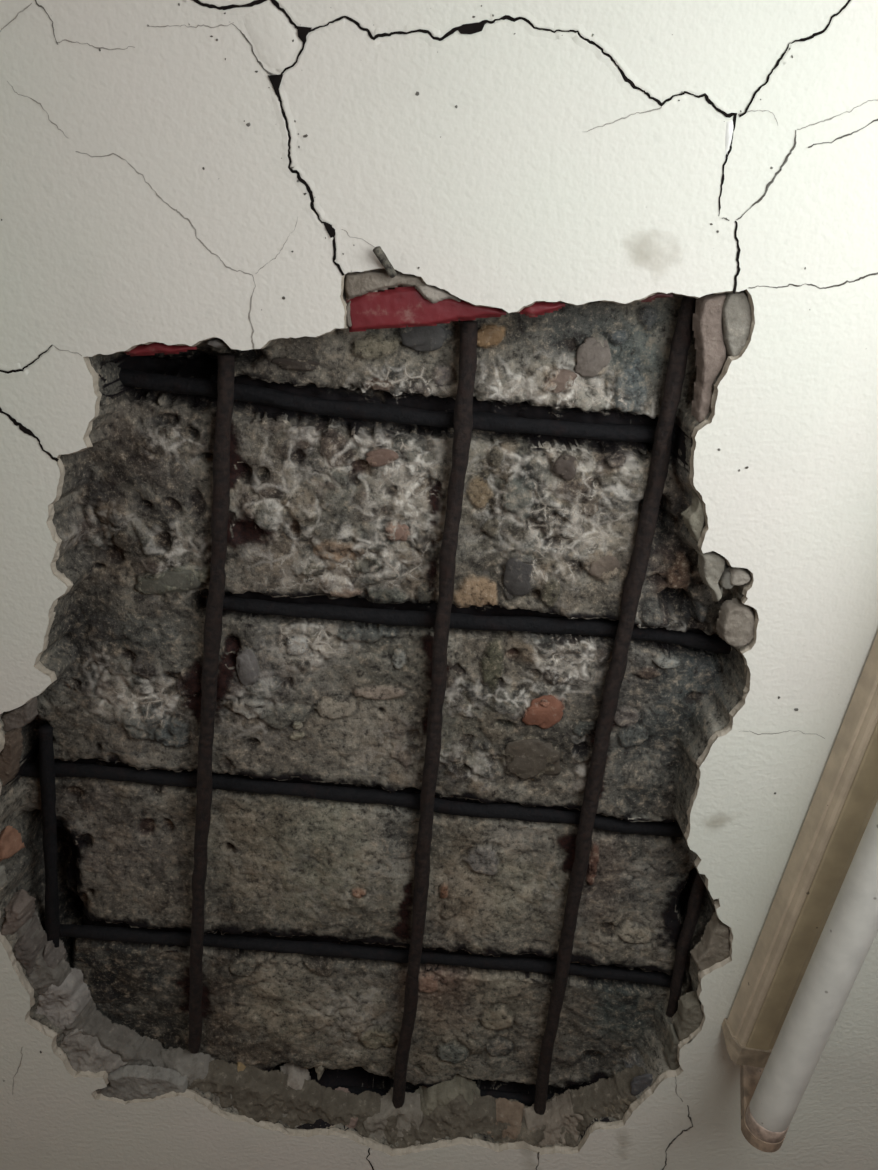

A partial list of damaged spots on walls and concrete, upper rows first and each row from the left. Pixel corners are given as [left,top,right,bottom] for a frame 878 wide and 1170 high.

crack [5,0,878,349]
crack [0,342,81,380]
crack [0,407,59,462]
spalling [0,268,759,1156]
crack [662,1076,693,1170]